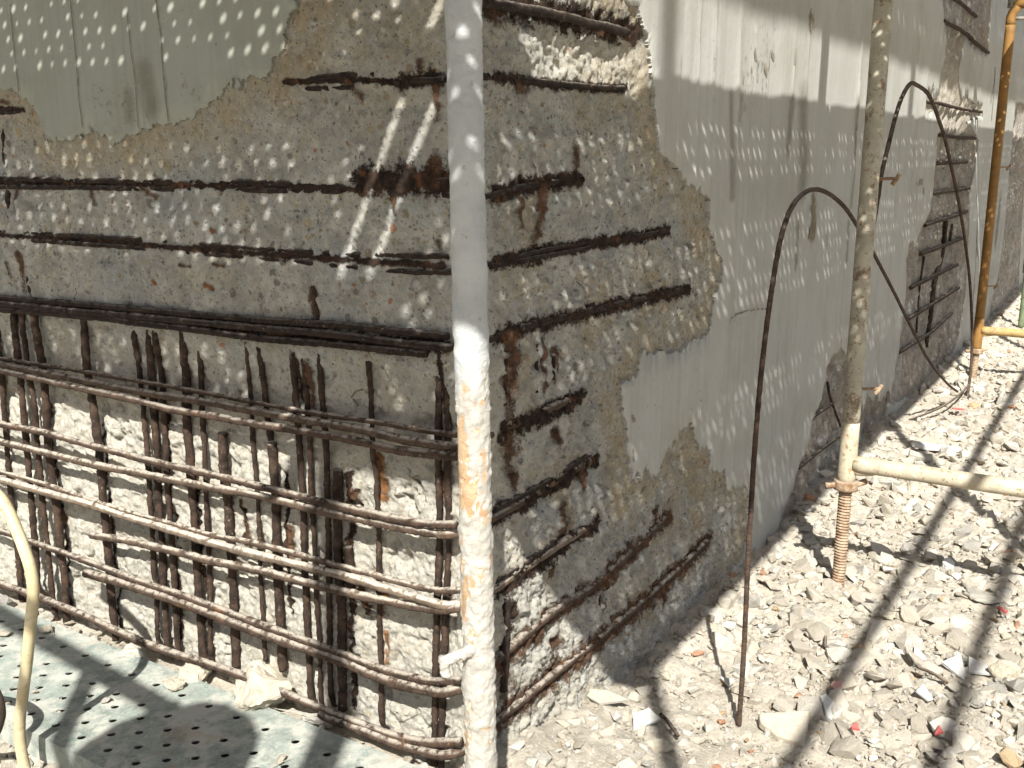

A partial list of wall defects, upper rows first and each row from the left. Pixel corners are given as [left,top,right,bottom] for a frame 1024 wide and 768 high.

rust [282,58,445,120]
rust [0,154,450,216]
spalling [860,0,990,436]
spalling [0,0,466,768]
rust [191,286,451,416]
spalling [481,0,857,744]
rust [60,500,74,607]
rust [239,499,253,549]
rust [282,472,296,615]
rust [343,470,364,507]
rust [492,283,713,738]
rust [347,585,389,653]